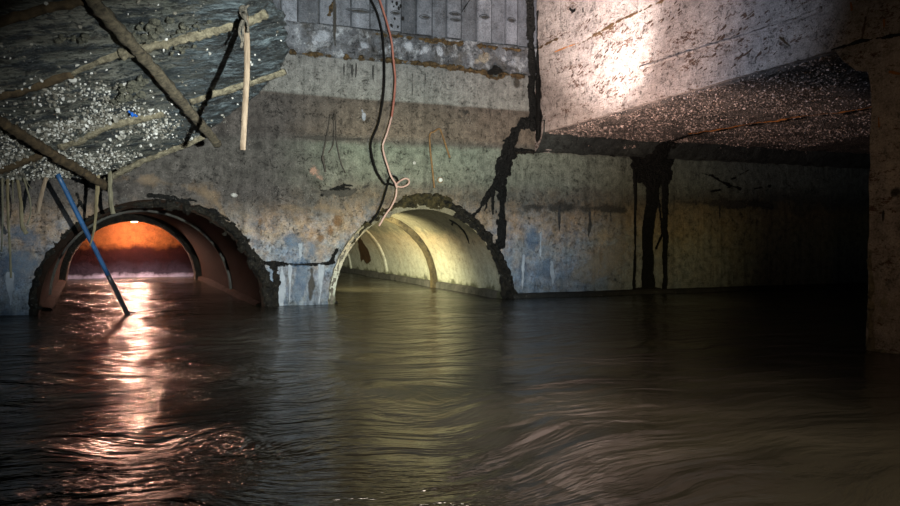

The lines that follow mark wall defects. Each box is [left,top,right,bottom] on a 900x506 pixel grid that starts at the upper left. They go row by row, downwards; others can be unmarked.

corrosion [343,54,525,80]
crack [514,0,561,155]
water stain [521,142,680,290]
water stain [278,235,325,306]
crack [264,248,339,306]